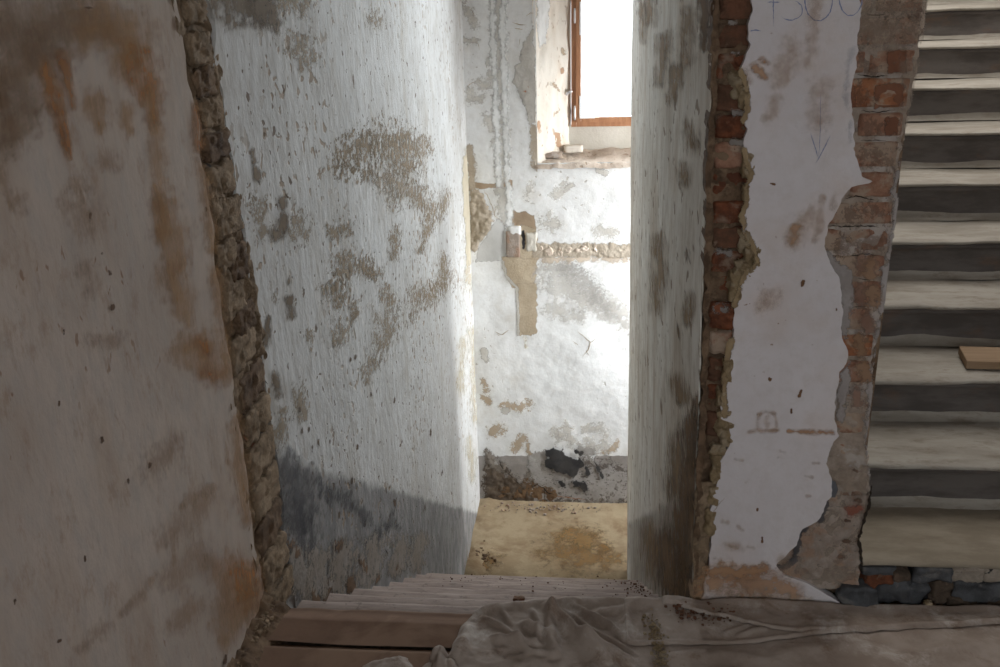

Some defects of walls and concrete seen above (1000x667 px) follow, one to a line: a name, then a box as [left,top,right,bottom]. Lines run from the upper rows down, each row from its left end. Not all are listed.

corrosion [41,51,75,159]
peeling [464,56,502,146]
peeling [512,0,550,172]
flaking render [171,0,434,603]
peeling [318,108,456,262]
peeling [315,218,460,396]
flaking render [466,144,513,252]
flaking render [502,181,630,336]
flaking render [688,0,761,600]
flaking render [776,0,927,589]
water stain [545,448,604,493]